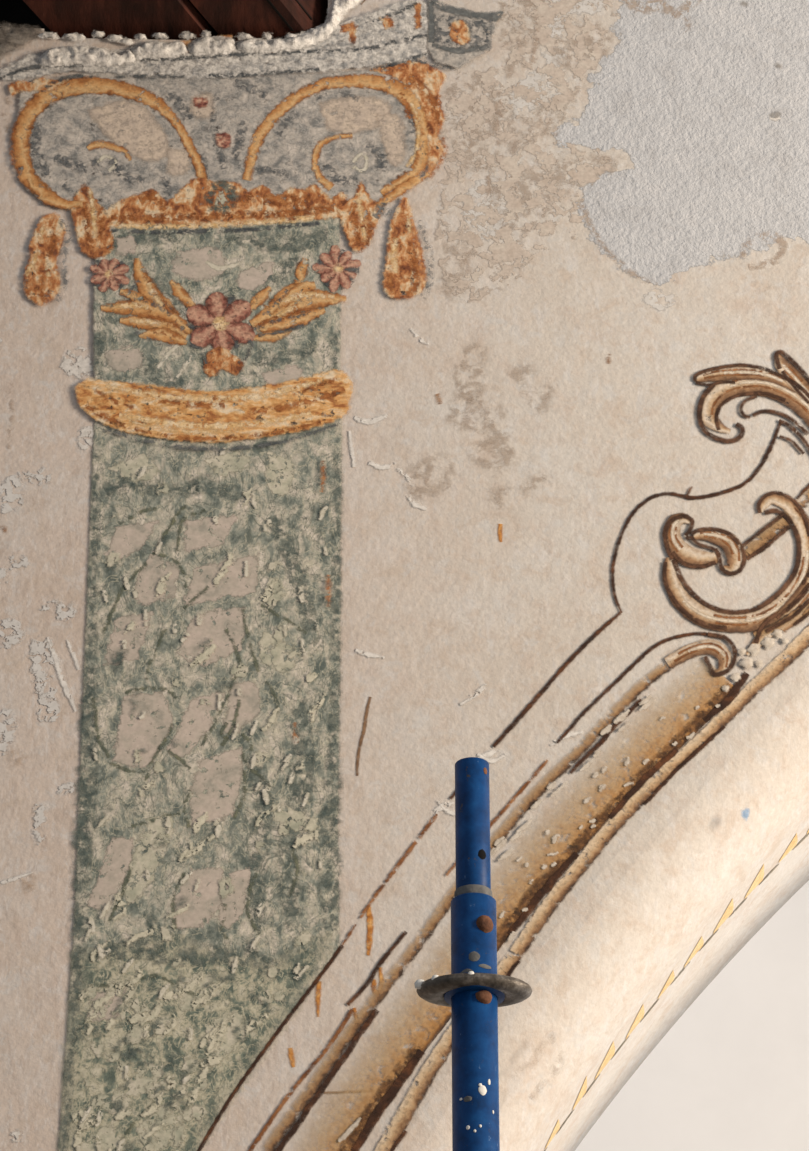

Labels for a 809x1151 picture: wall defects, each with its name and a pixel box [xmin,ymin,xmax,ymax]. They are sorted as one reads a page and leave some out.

peeling [510,0,604,119]
peeling [551,0,809,311]